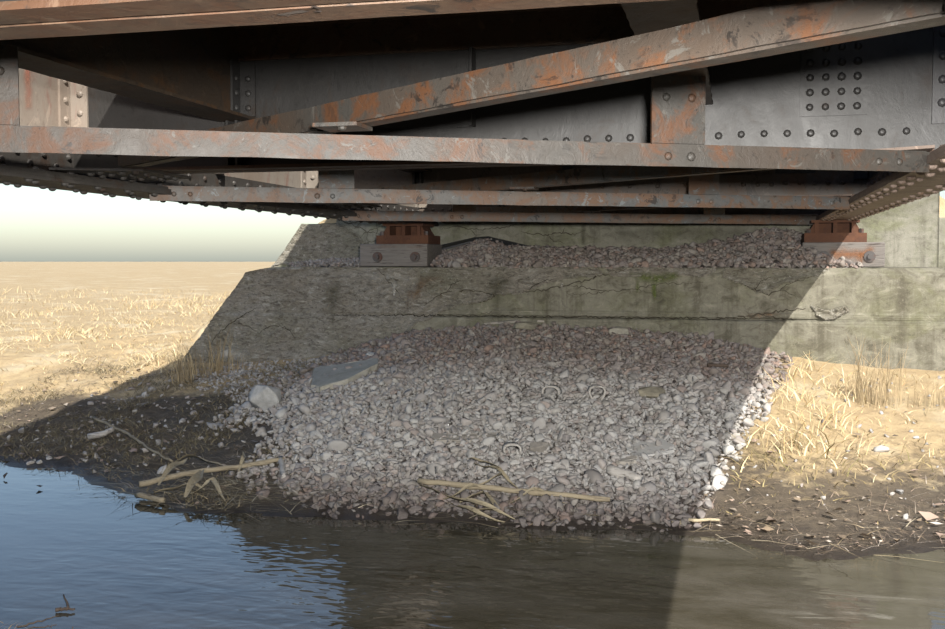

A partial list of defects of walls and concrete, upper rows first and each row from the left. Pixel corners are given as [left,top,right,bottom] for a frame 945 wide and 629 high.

crack [335,270,817,320]